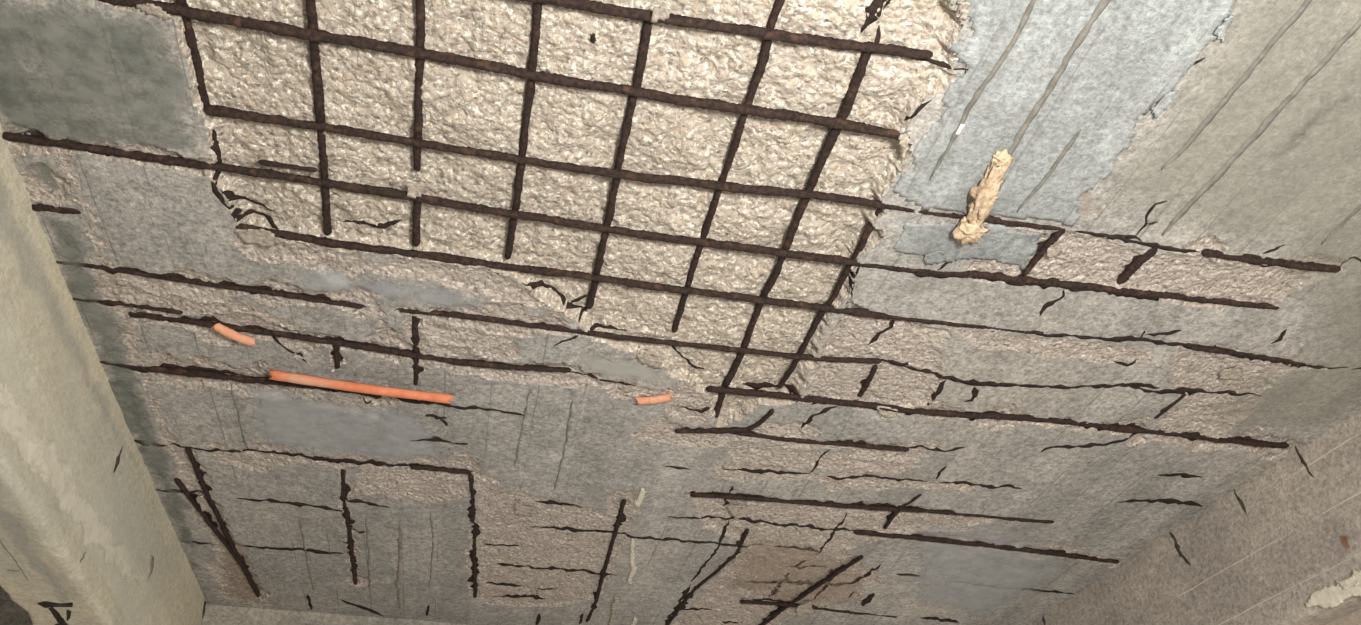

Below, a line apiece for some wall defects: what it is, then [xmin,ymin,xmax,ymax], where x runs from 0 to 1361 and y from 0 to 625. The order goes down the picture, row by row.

peeling [0,0,1352,492]
spalling [164,448,272,607]
crack [147,498,435,617]
crack [113,397,524,473]
spalling [202,440,646,622]
crack [485,445,1022,625]
crack [801,405,838,428]
spalling [665,488,1127,625]
crack [965,582,1074,625]
crack [1117,473,1203,566]
crack [1234,489,1248,516]
crack [1295,446,1315,478]